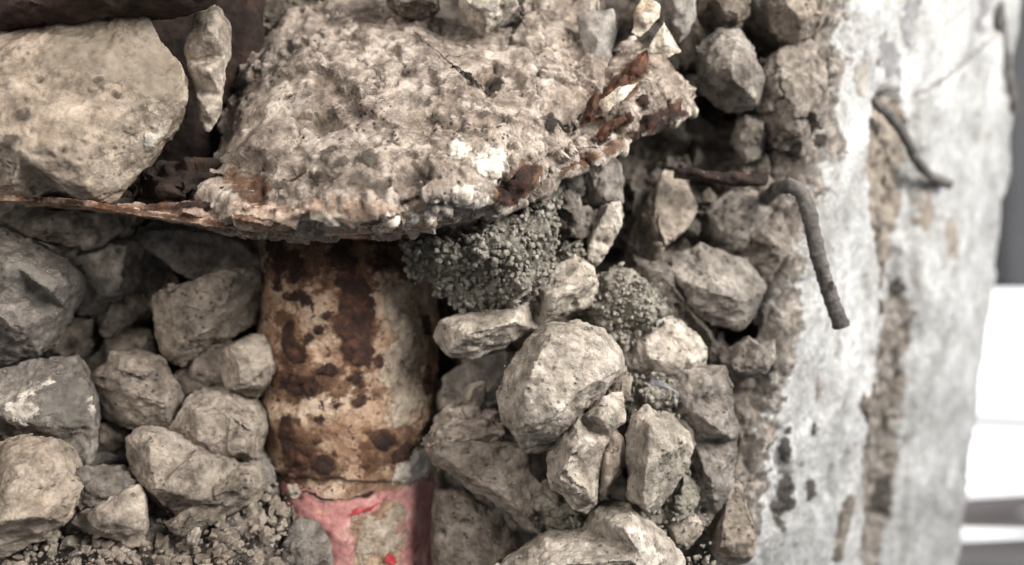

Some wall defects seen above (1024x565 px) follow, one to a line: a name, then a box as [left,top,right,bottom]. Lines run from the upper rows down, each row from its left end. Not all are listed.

peeling [631,0,681,57]
spalling [1,131,19,152]
spalling [425,97,447,124]
spalling [487,76,505,92]
spalling [543,112,571,134]
rust [560,49,689,177]
spalling [307,145,391,206]
rust [491,153,544,209]
spalling [736,0,954,565]
rust [109,166,439,485]
peeling [376,280,430,429]
peeling [279,447,436,565]